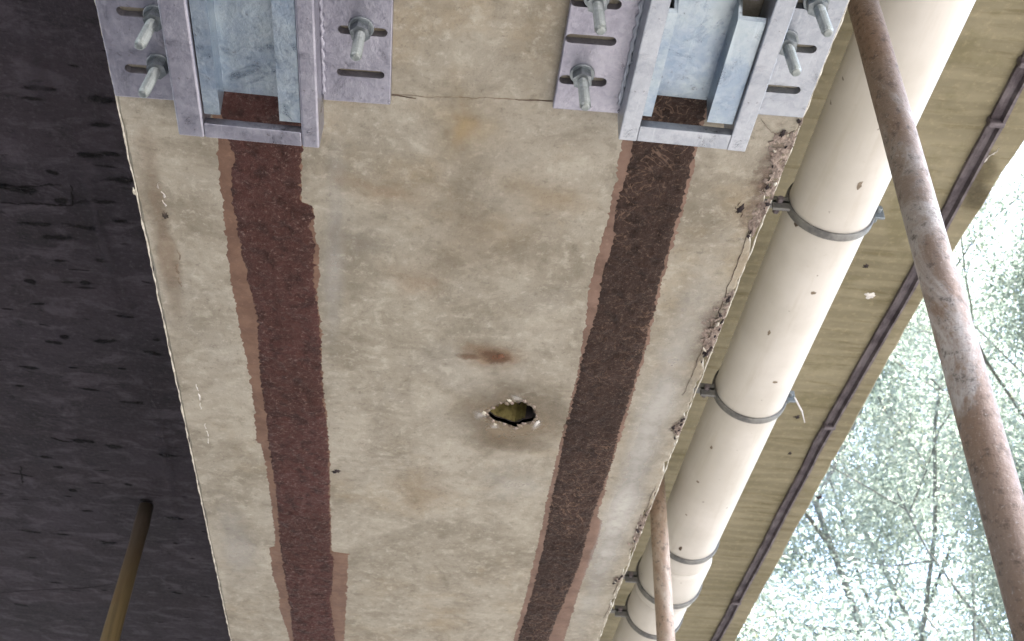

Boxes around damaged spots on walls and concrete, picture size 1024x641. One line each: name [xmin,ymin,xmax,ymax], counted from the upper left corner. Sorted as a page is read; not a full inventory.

crack [391,94,553,102]
spalling [735,112,806,242]
spalling [699,290,734,363]
rust [463,348,509,362]
spalling [478,396,540,430]
spalling [671,416,686,440]
spalling [627,504,652,552]